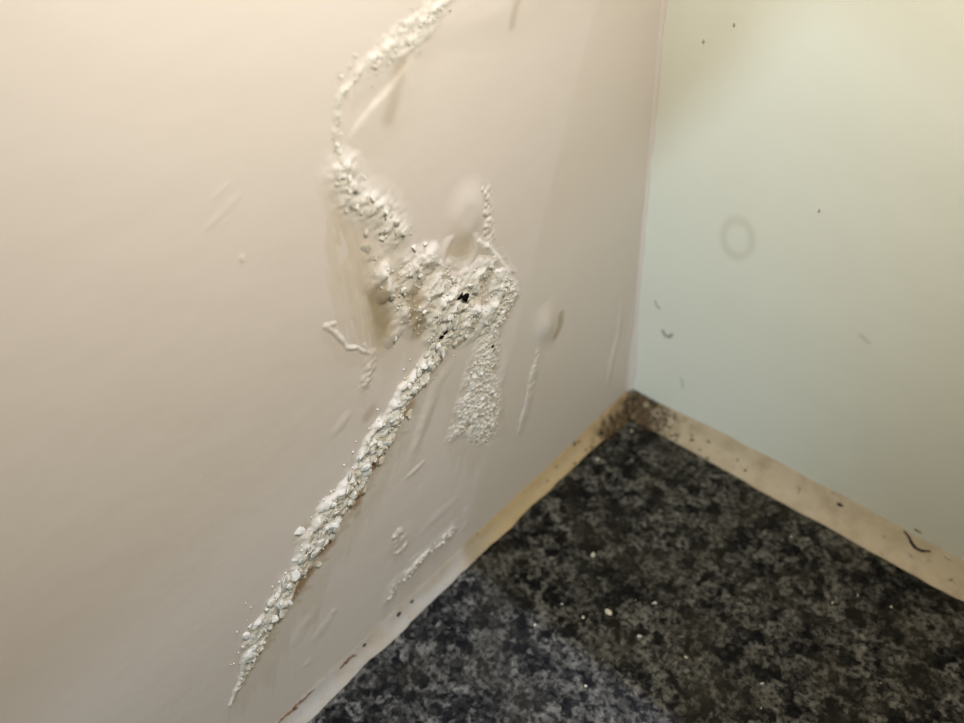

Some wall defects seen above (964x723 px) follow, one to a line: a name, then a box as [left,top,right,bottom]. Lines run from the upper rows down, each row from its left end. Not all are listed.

leakage [228,269,516,706]
leakage [573,390,710,460]